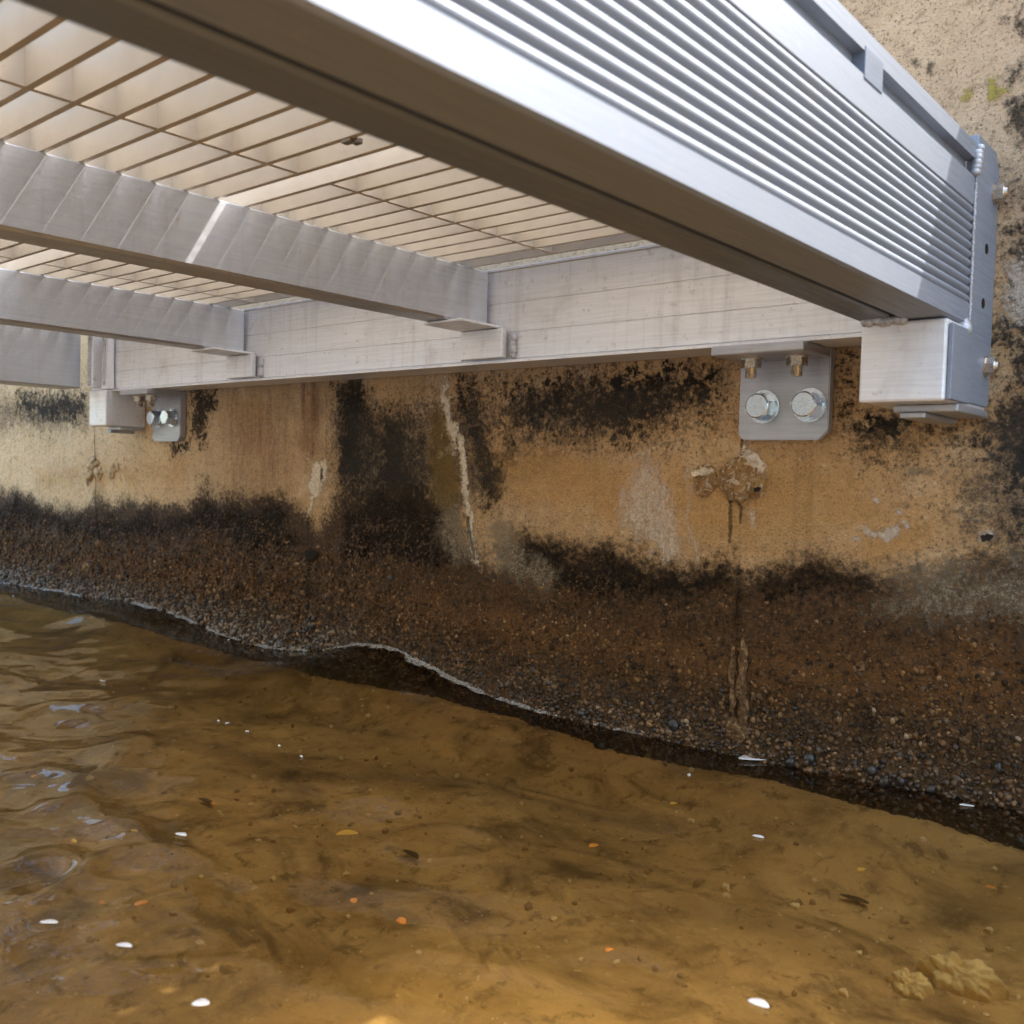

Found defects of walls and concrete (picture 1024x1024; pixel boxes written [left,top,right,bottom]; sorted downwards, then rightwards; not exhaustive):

water stain [0,372,1024,846]
spalling [0,455,1024,850]
peeling [739,445,766,473]